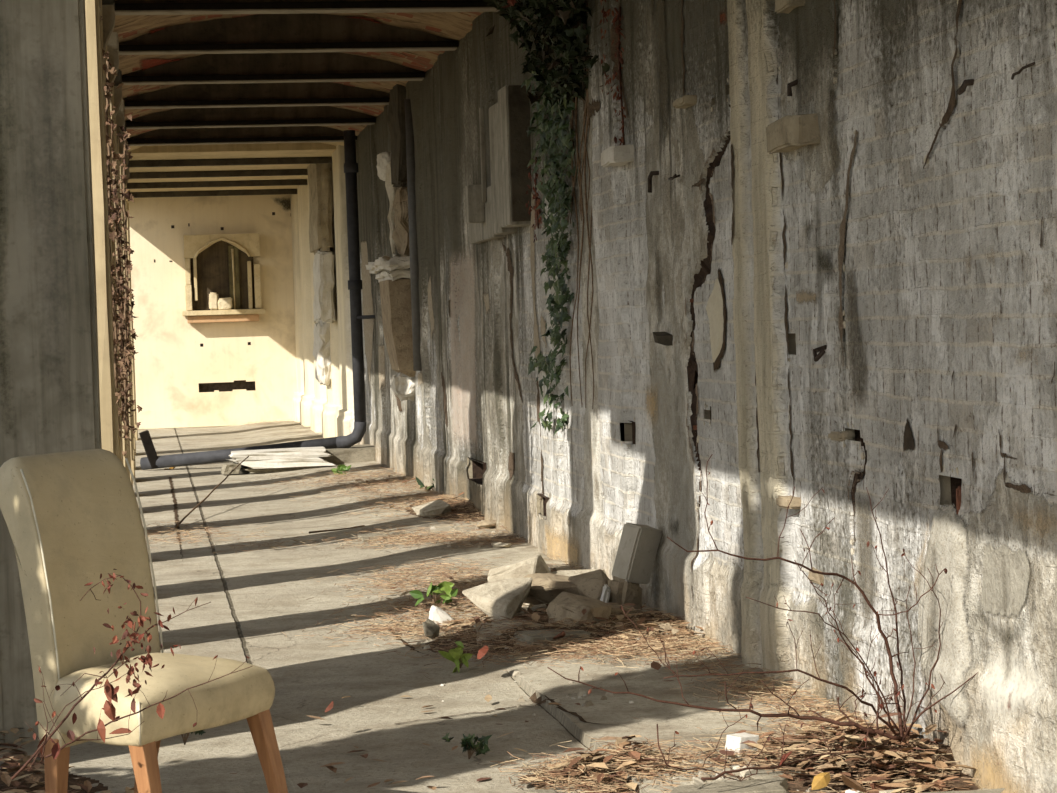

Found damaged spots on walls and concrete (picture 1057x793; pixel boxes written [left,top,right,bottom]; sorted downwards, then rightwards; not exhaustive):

crack [922,0,969,171]
crack [685,100,734,627]
peeling [706,269,726,371]
crack [838,130,858,365]
crack [847,442,867,601]